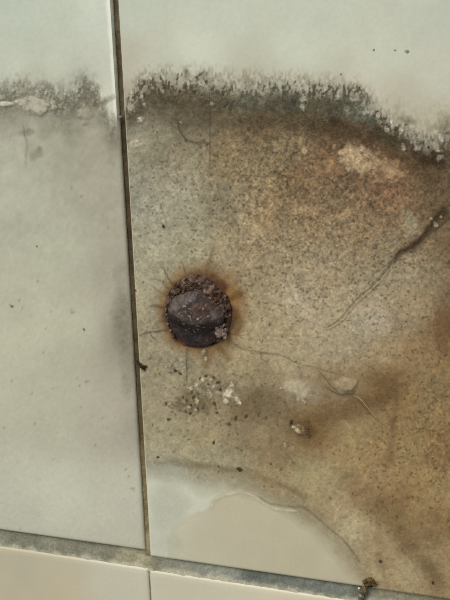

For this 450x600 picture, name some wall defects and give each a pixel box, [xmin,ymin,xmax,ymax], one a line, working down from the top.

rust [160,268,241,354]
leakage [125,73,450,598]
crack [325,202,450,329]